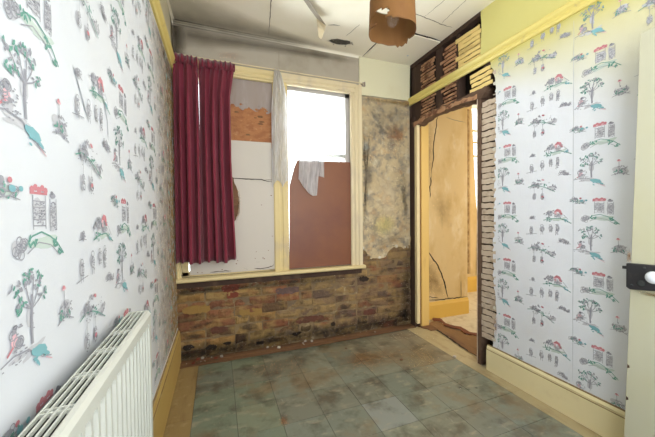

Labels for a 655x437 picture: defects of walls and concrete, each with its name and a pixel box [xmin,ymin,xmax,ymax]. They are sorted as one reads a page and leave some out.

peeling [230,103,272,148]
crack [429,117,462,197]
leakage [181,274,409,359]
crack [429,253,467,301]